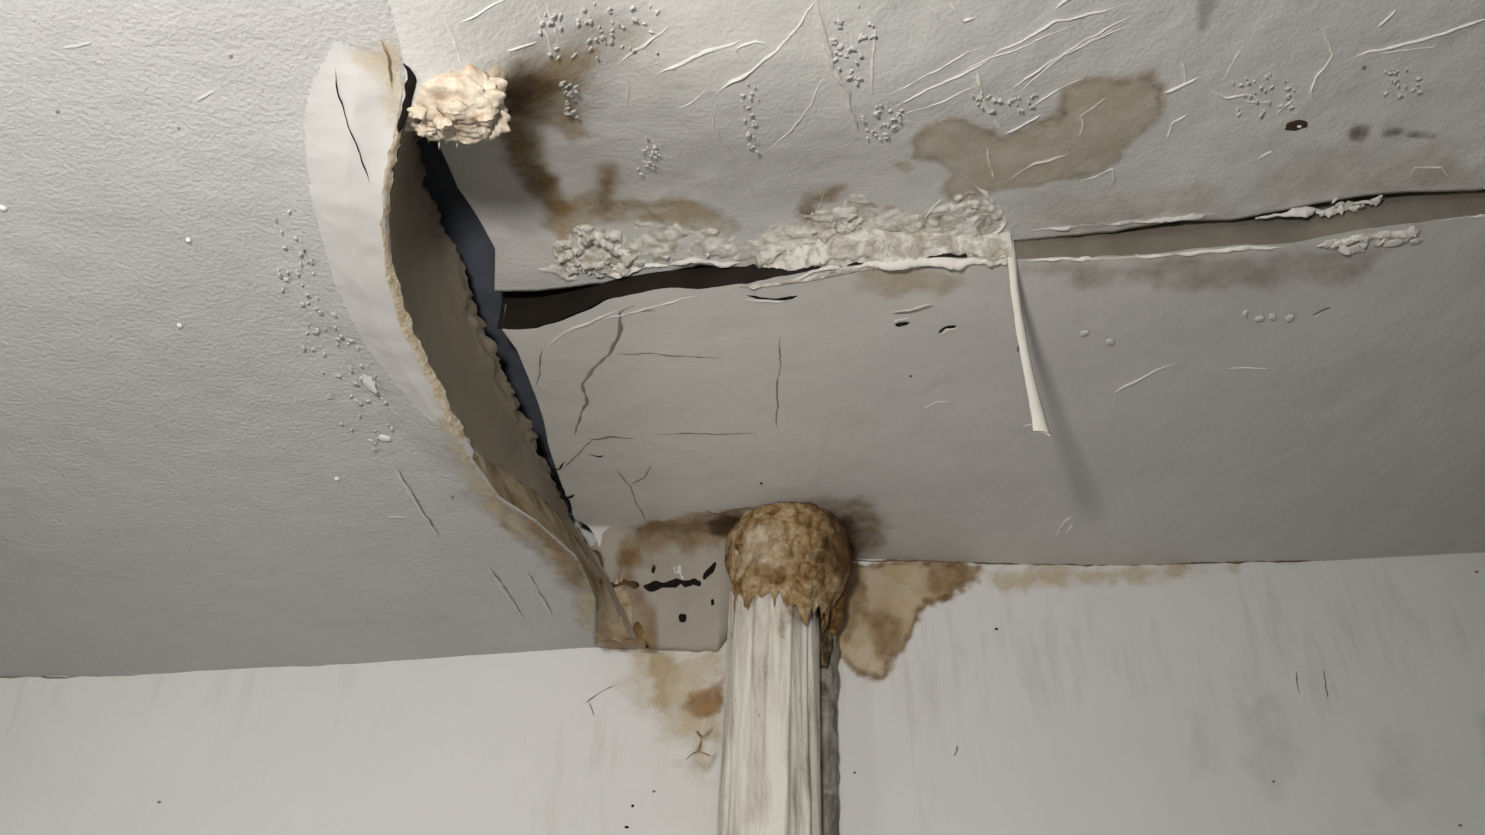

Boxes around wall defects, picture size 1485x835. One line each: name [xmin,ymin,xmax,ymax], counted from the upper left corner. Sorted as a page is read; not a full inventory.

damp [504,58,627,236]
crack [927,190,1485,259]
crack [497,262,863,592]
damp [611,512,741,738]
damp [819,503,979,678]